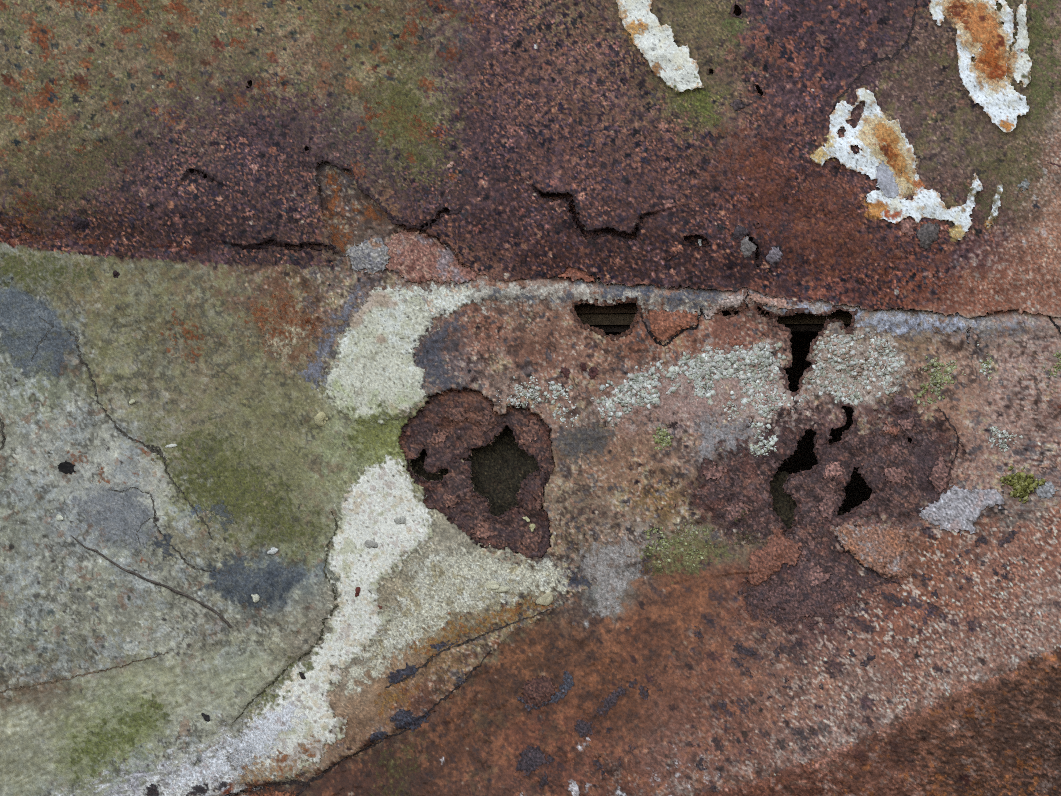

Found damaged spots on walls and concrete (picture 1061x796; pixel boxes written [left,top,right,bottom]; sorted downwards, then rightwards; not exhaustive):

peeling [616,0,713,93]
rust [936,0,1024,93]
peeling [929,0,1032,133]
rust [857,114,927,195]
peeling [810,87,983,240]
crack [231,236,338,254]
rust [323,170,477,286]
crack [640,308,706,347]
spalling [784,324,824,392]
rust [832,519,920,579]
crack [234,511,339,722]
crack [225,609,550,796]